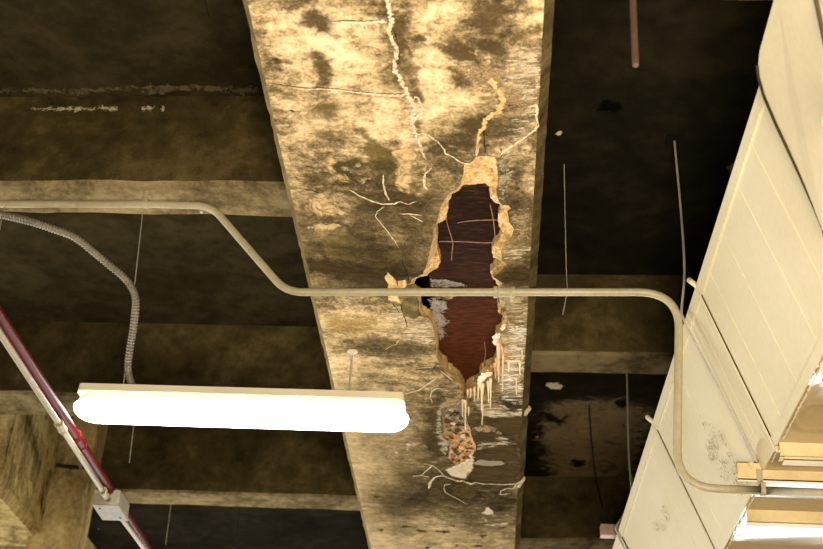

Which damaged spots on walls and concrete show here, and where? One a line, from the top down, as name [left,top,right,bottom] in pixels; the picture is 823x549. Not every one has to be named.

water stain [299,10,337,36]
water stain [312,51,334,86]
water stain [394,22,427,103]
water stain [443,0,541,200]
water stain [334,129,396,175]
peeling [392,145,417,193]
crack [277,0,543,281]
spalling [385,156,531,394]
spalling [442,406,476,465]
water stain [427,297,528,501]
water stain [535,397,656,477]
crack [418,464,523,507]